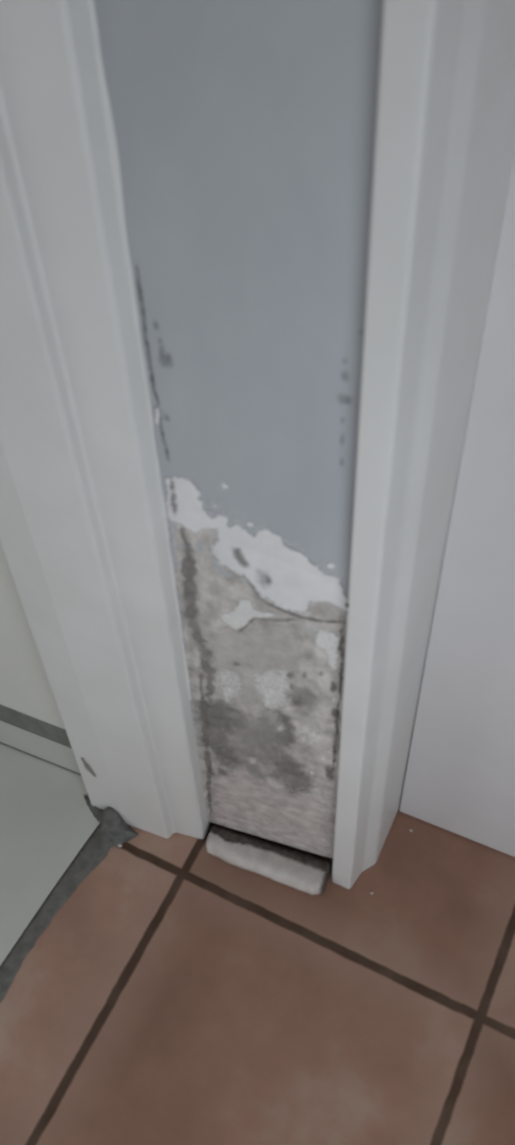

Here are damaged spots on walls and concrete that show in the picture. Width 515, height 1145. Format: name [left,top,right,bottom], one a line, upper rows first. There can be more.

leakage [180,528,237,815]
spalling [165,476,348,859]
leakage [276,714,311,791]